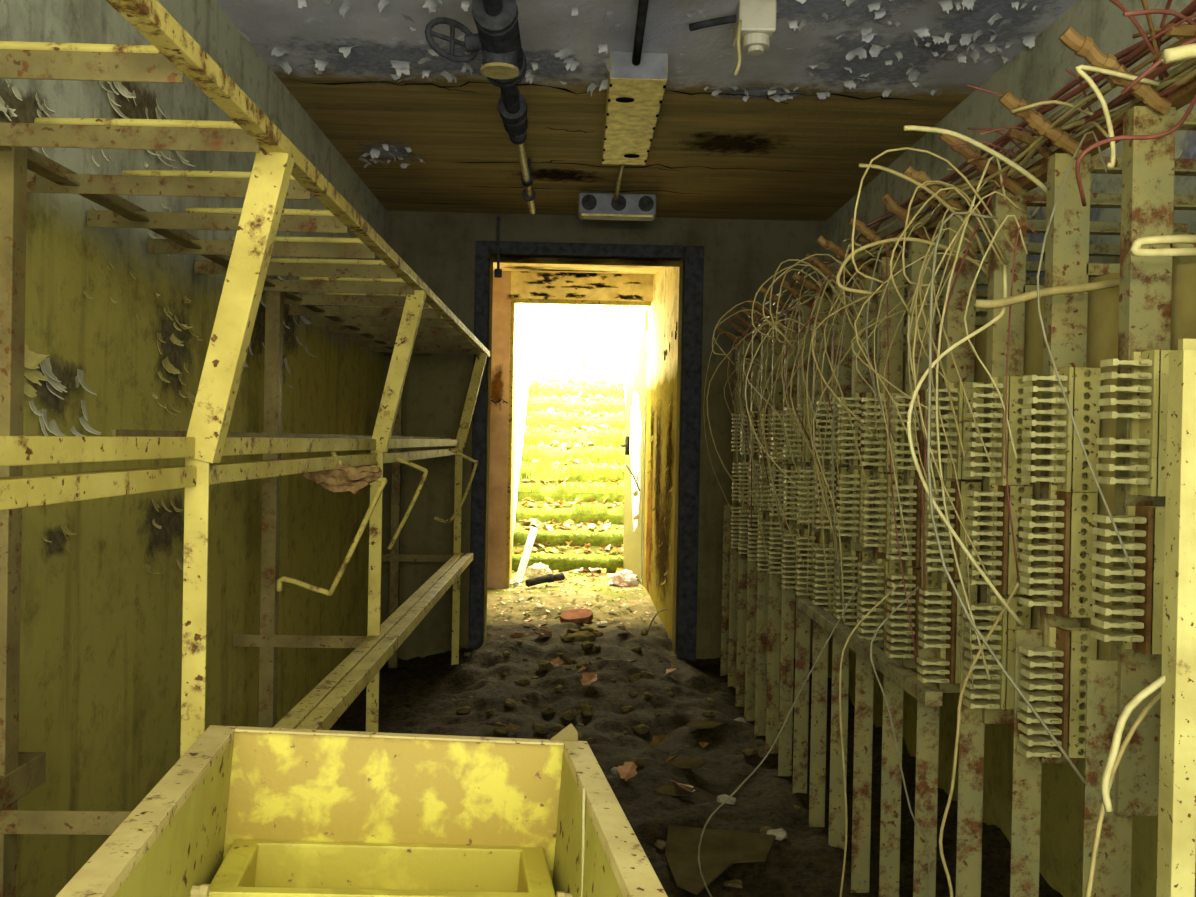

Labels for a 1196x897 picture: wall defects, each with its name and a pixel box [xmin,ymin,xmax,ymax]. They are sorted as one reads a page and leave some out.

peeling [422,0,442,13]
peeling [505,257,668,301]